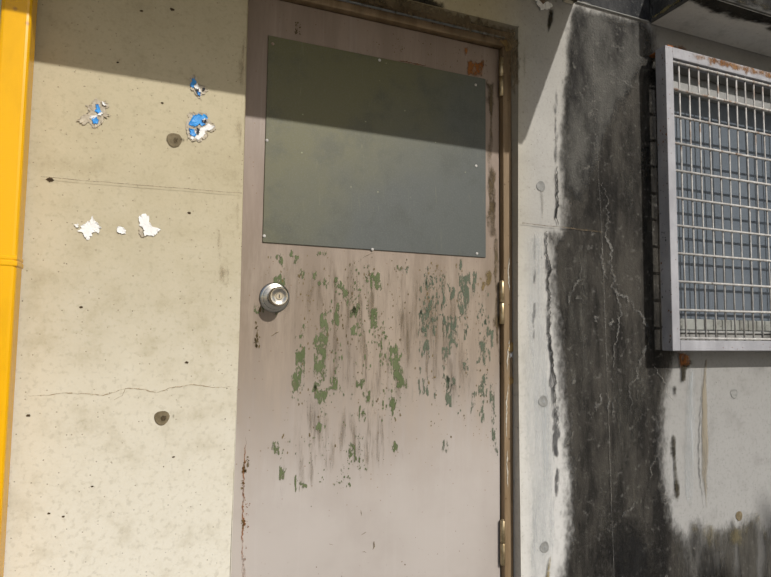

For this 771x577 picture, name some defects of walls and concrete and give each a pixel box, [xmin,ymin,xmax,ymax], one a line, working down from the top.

damp [364,0,519,87]
peeling [89,102,106,124]
peeling [189,114,215,140]
peeling [74,216,101,240]
peeling [139,214,161,236]
damp [543,0,771,577]
peeling [267,168,513,484]
rust [679,353,690,380]
peeling [334,435,367,494]